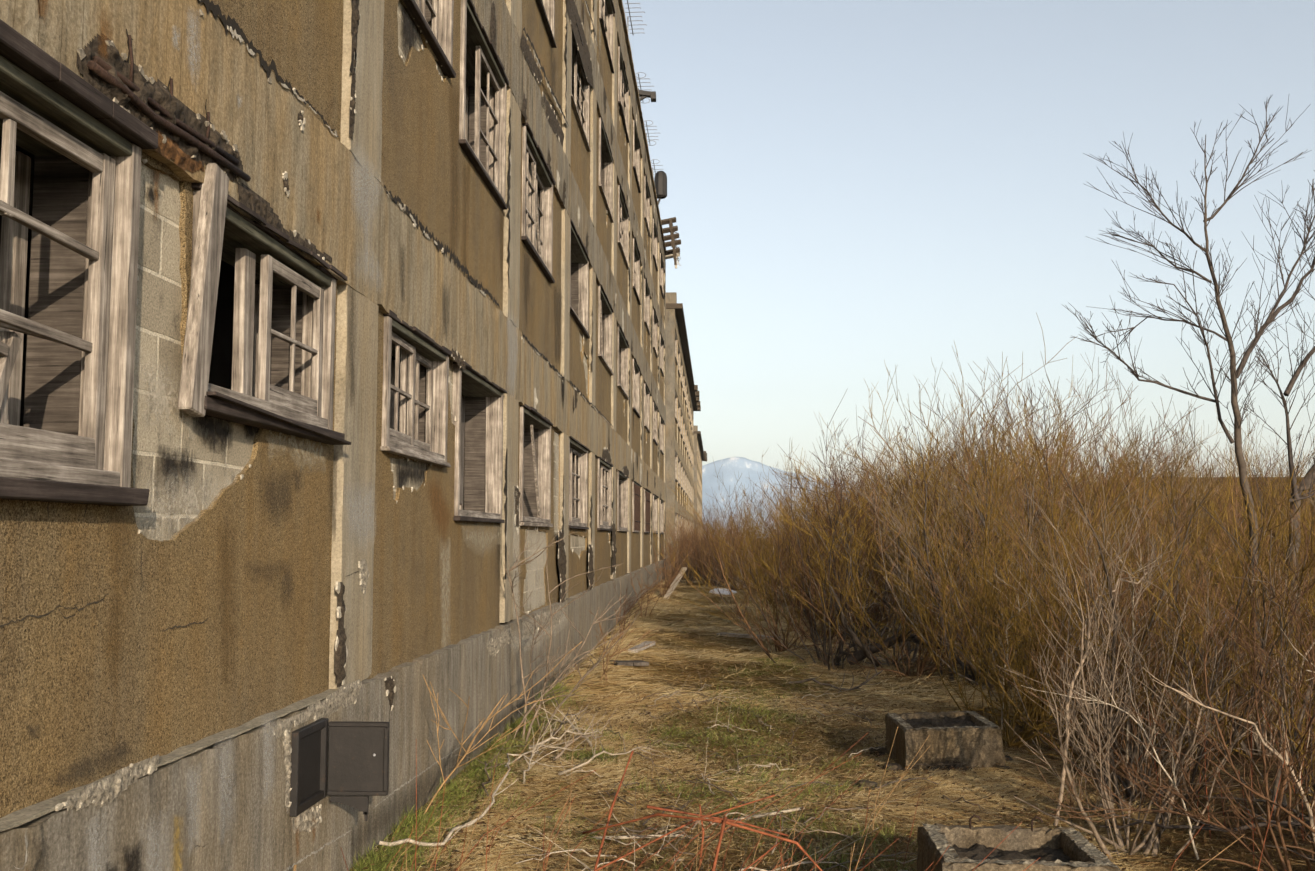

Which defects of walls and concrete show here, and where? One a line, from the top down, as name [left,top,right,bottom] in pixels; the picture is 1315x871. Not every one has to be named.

spalling [77,33,332,541]
crack [0,594,109,627]
peeling [335,581,347,619]
spalling [259,636,362,834]
spalling [55,754,159,811]
leakage [107,847,140,871]